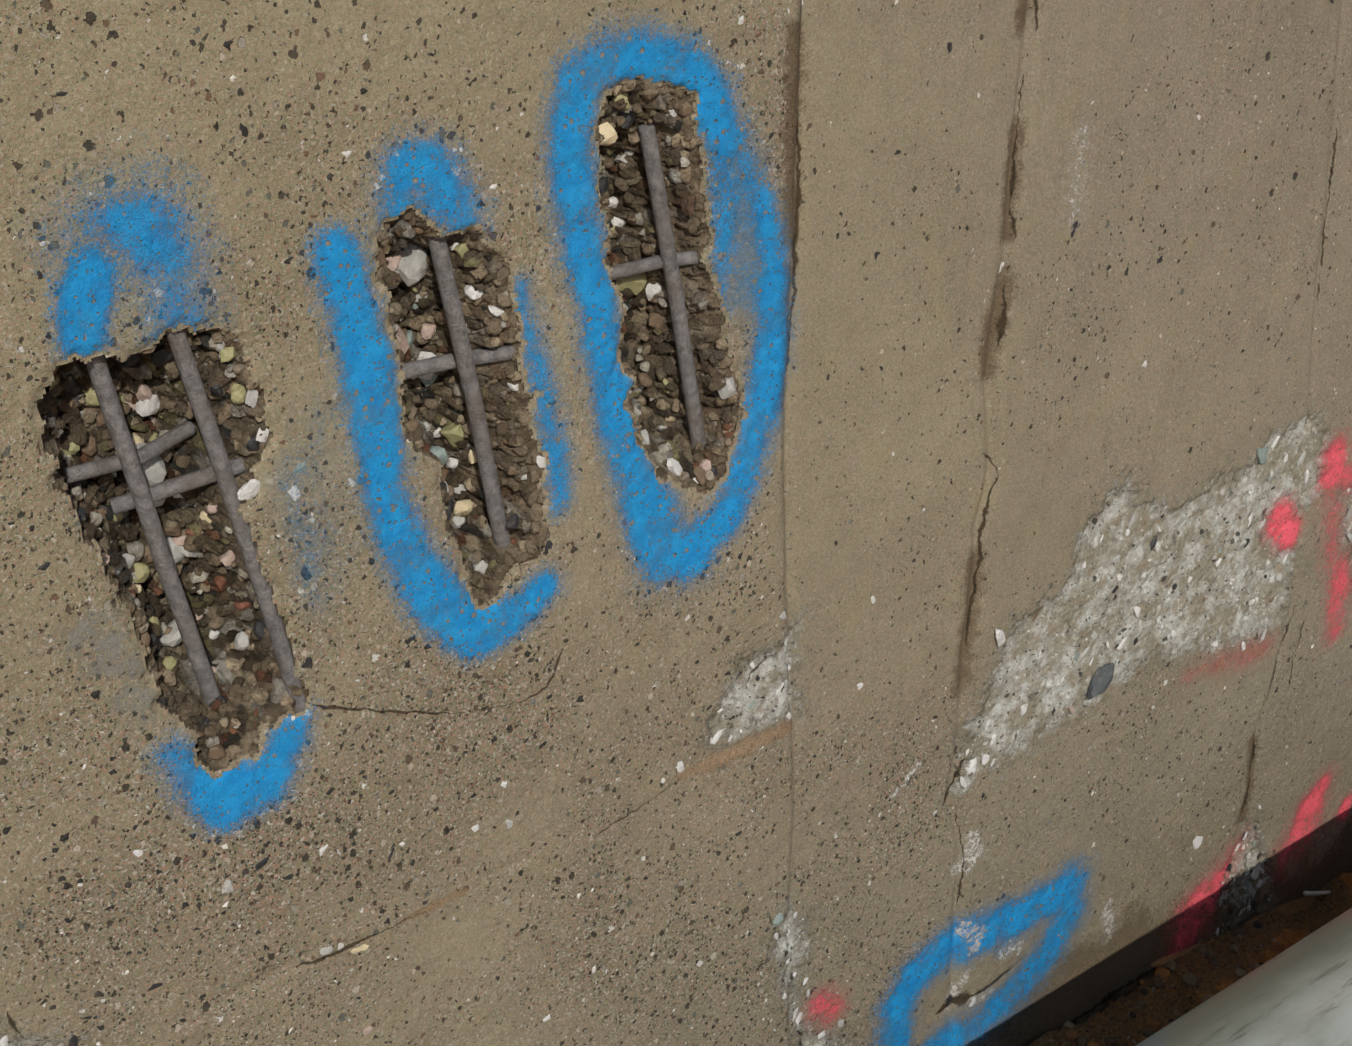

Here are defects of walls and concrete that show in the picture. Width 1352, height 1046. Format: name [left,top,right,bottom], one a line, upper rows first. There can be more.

crack [1032,0,1040,33]
crack [1009,75,1024,238]
spalling [375,208,550,606]
spalling [595,77,743,493]
crack [997,285,1007,345]
spalling [36,327,309,772]
spalling [702,607,818,752]
crack [965,452,999,645]
spalling [941,404,1352,807]